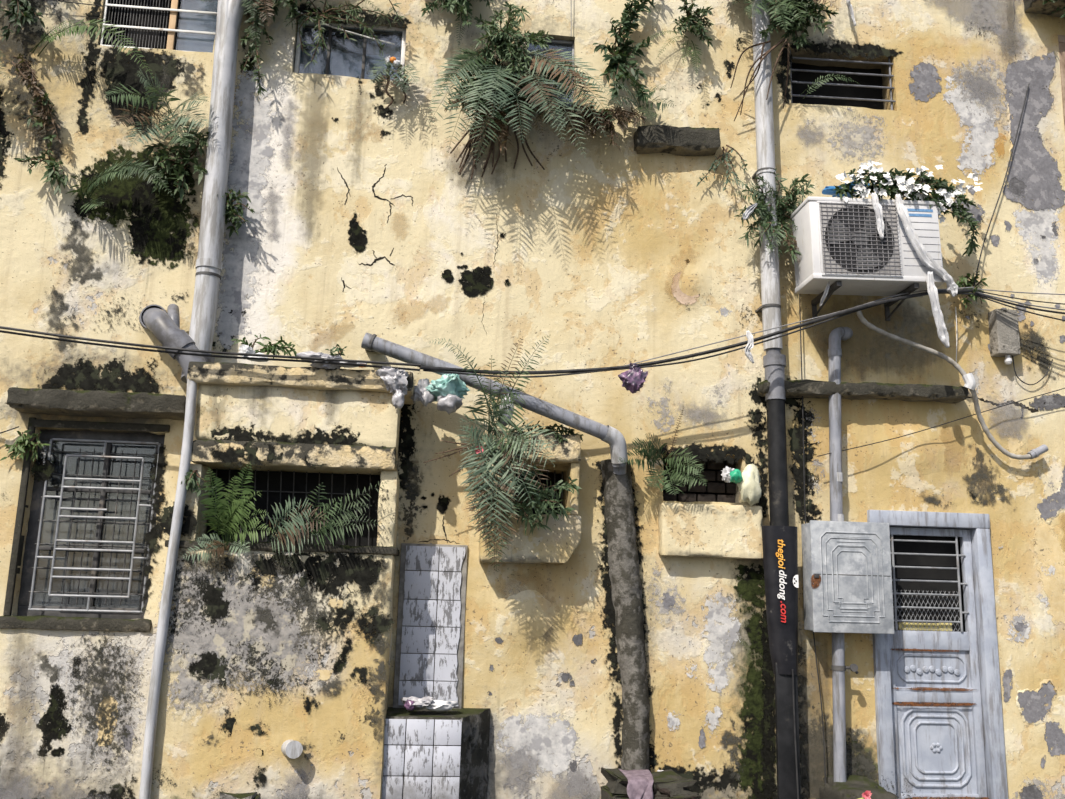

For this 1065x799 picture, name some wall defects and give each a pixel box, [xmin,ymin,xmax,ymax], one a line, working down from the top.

damp [73,0,206,135]
crack [337,164,413,223]
flaking render [909,51,1065,285]
crack [341,248,394,291]
crack [967,397,1065,413]
damp [0,631,147,799]
damp [138,445,394,739]
damp [591,455,624,768]
rust [892,687,975,707]
peeling [1007,616,1033,645]
flaking render [1002,669,1065,799]
peeling [1006,432,1065,625]